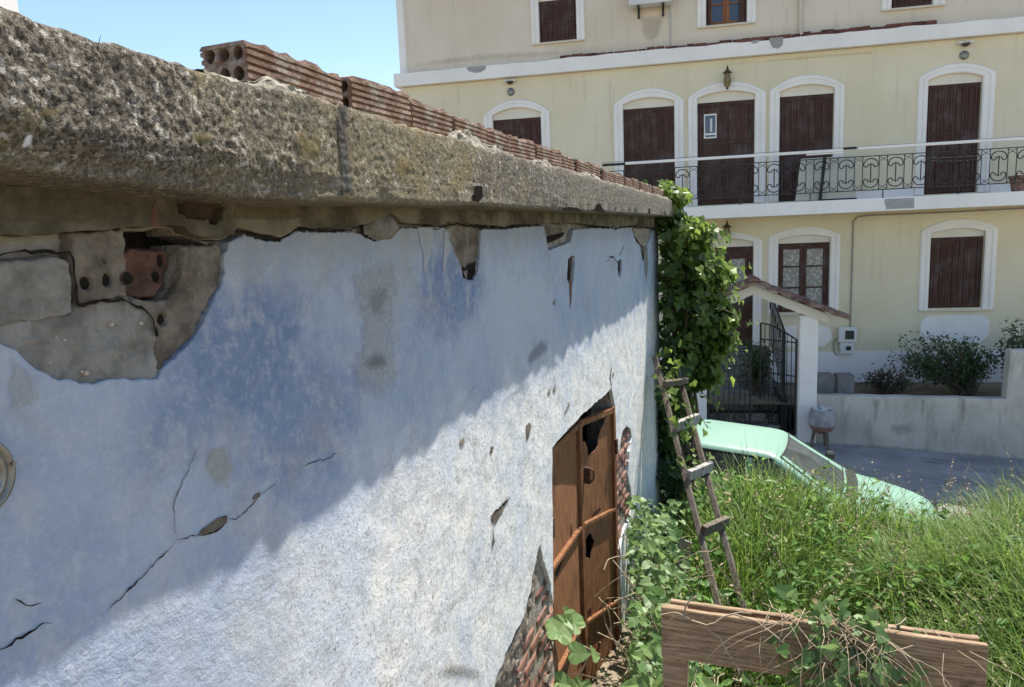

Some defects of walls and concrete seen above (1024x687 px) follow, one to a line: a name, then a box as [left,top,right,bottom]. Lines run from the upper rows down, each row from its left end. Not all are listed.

spalling [177,202,218,223]
spalling [418,223,479,280]
spalling [539,223,567,244]
spalling [0,228,220,384]
spalling [616,427,630,538]
crack [109,449,198,610]
spalling [491,498,510,549]
crack [0,599,52,650]
spalling [495,552,555,687]